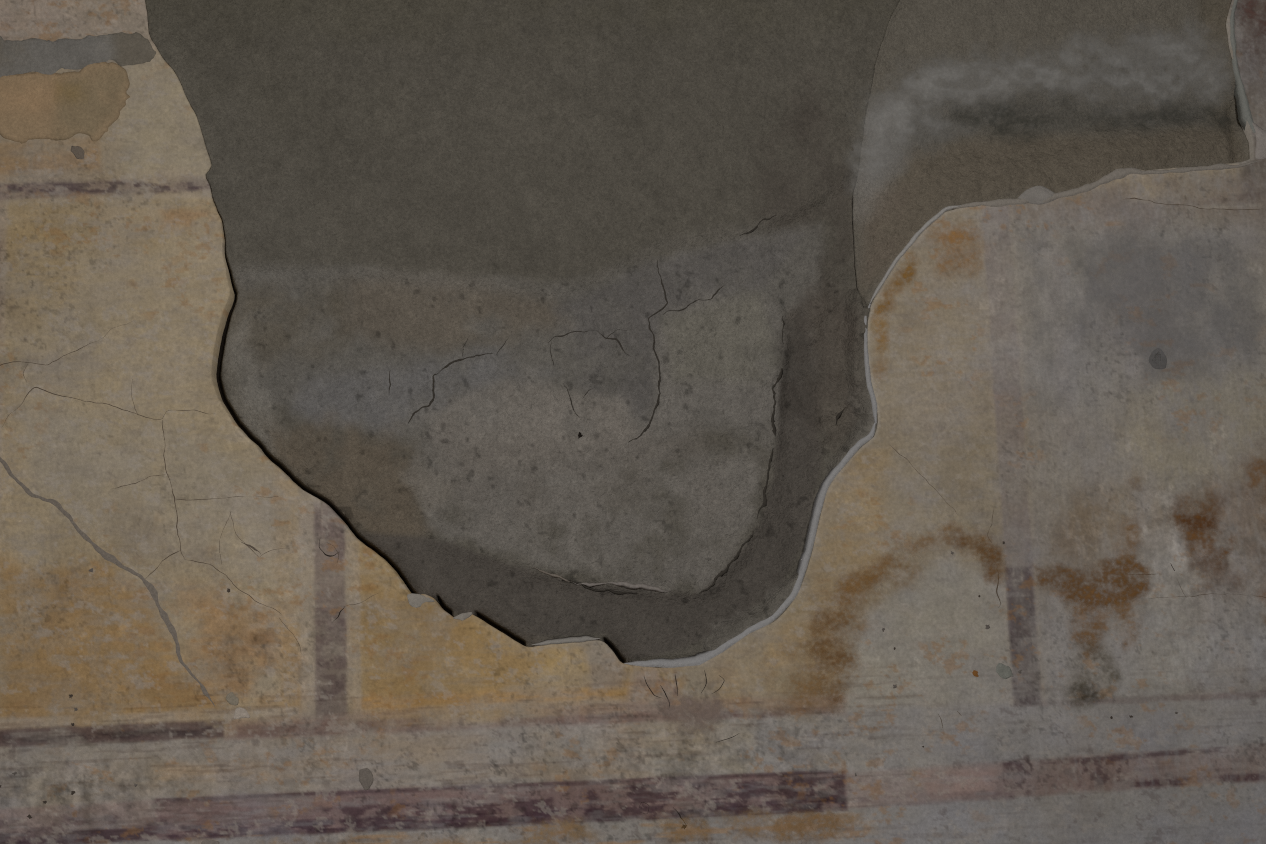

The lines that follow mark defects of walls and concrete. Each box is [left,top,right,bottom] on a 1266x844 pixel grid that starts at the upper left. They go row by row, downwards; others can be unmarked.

crack [740,215,776,236]
crack [408,339,507,423]
crack [548,262,723,443]
flaking render [145,0,1266,727]
crack [0,324,301,706]